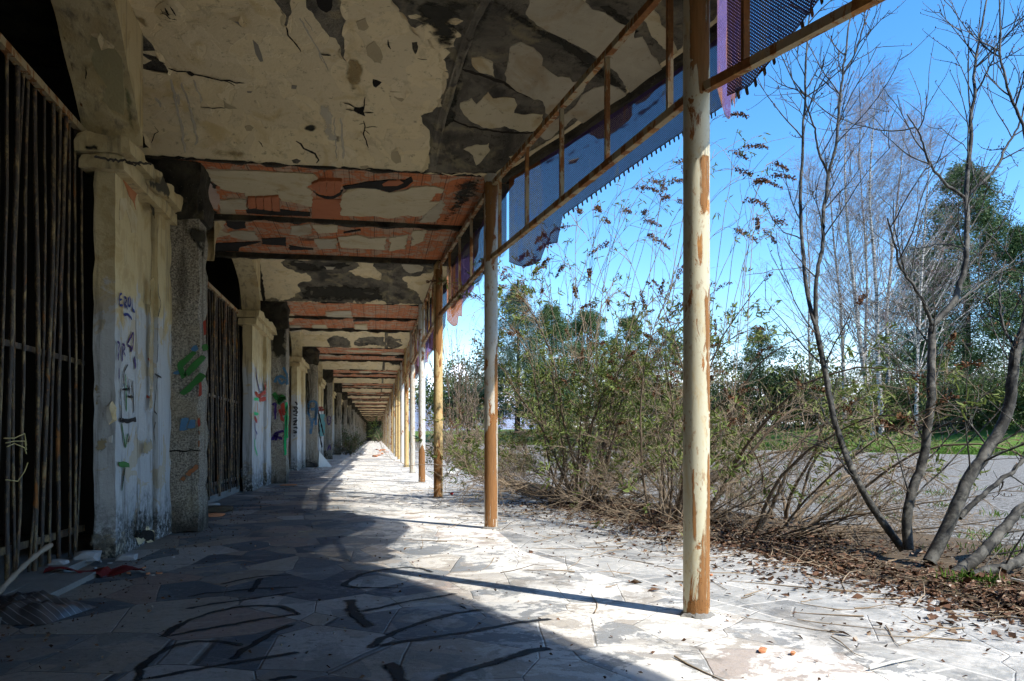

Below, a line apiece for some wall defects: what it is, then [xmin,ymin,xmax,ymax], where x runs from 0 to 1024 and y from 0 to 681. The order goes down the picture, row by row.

peeling [710,0,722,22]
spalling [143,35,172,75]
crack [168,68,241,109]
peeling [306,0,683,199]
peeling [215,207,434,305]
crack [296,121,482,177]
rust [485,181,498,262]
rust [700,155,709,214]
peeling [327,319,404,358]
rust [435,269,443,355]
rust [484,340,498,527]
rust [687,454,710,614]